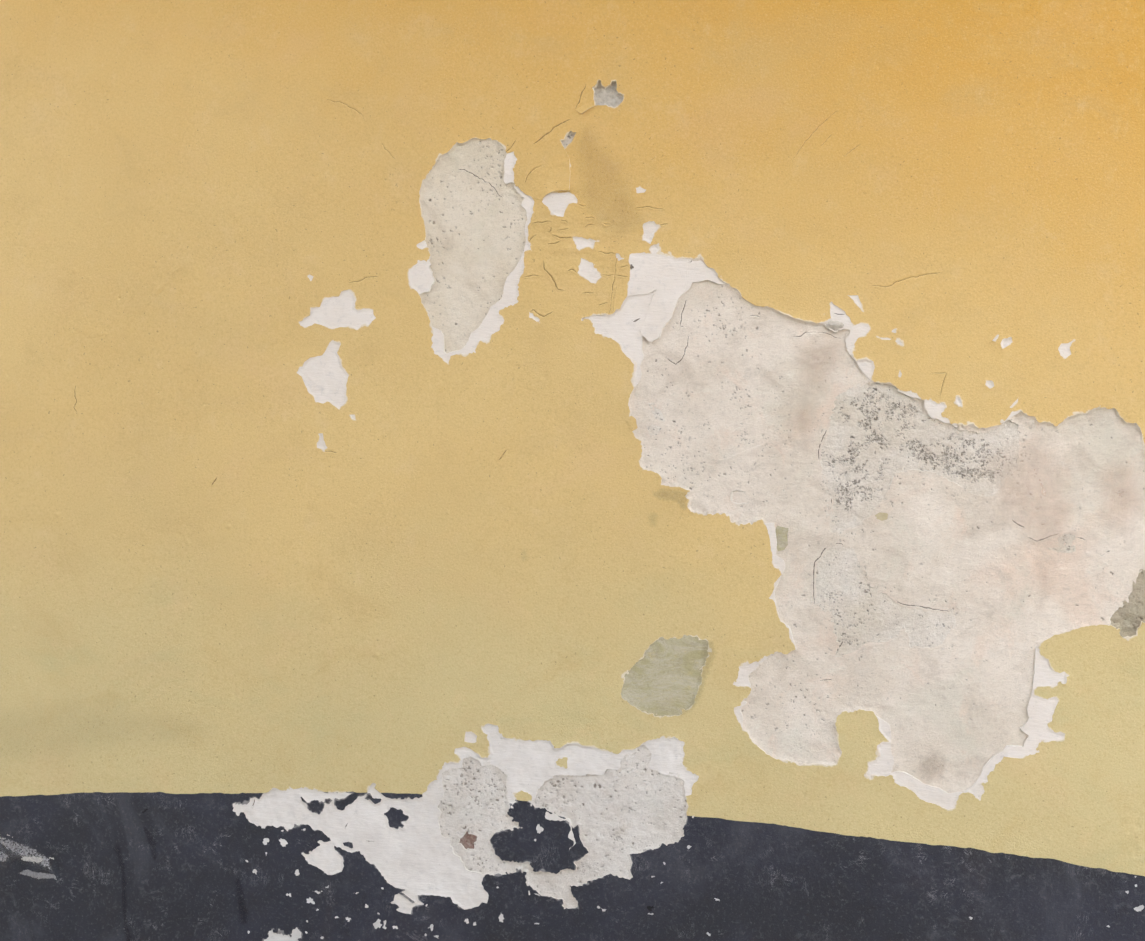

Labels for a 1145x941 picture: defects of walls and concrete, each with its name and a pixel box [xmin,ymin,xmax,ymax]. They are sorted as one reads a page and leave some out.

spalling [576,81,623,114]
peeling [297,290,376,419]
peeling [409,132,578,363]
crack [524,202,668,321]
peeling [581,221,1145,809]
peeling [233,724,699,941]